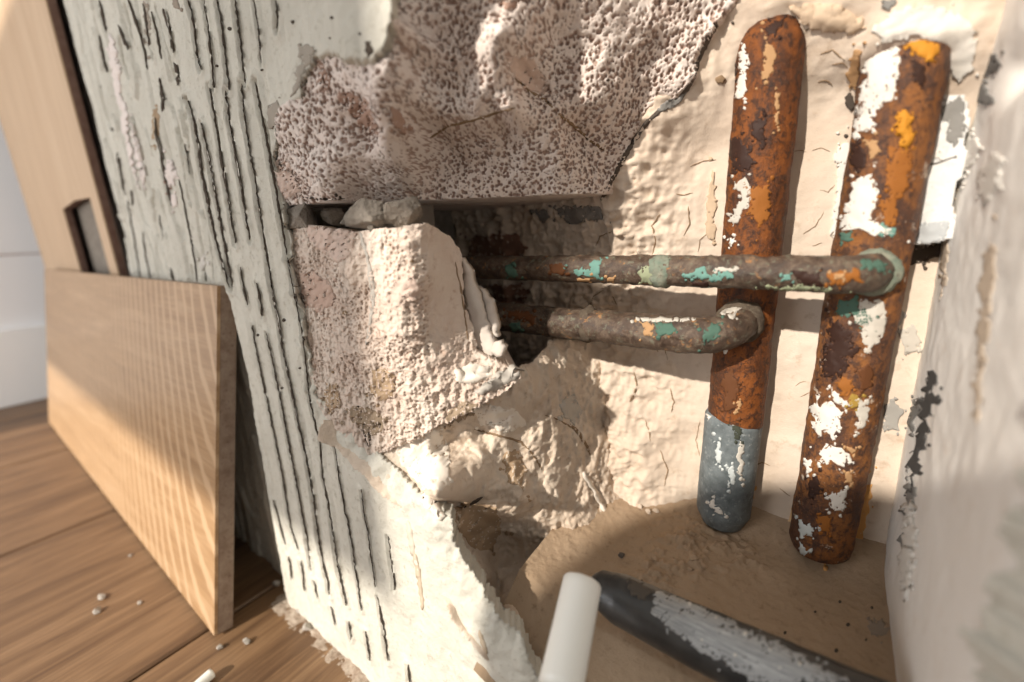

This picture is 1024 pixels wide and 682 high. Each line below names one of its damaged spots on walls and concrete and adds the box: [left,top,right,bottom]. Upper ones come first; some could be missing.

peeling [105,33,147,191]
spalling [267,43,414,137]
crack [430,78,604,151]
rust [728,108,775,242]
rust [848,137,867,178]
rust [876,109,917,235]
rust [903,40,940,89]
spalling [302,225,360,263]
spalling [451,0,1024,682]
rust [816,307,874,412]
crack [474,429,542,470]
crack [545,415,591,456]